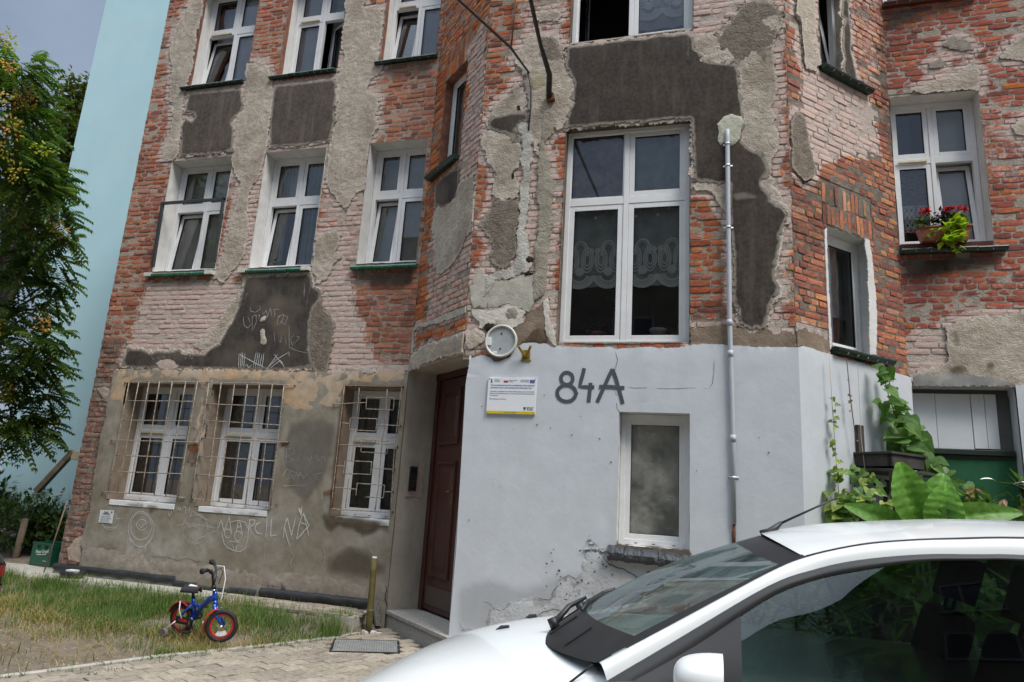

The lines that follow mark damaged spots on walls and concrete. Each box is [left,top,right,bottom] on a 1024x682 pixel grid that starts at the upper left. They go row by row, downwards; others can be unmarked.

peeling [156,359,179,370]
spalling [67,535,83,562]
peeling [486,537,694,626]